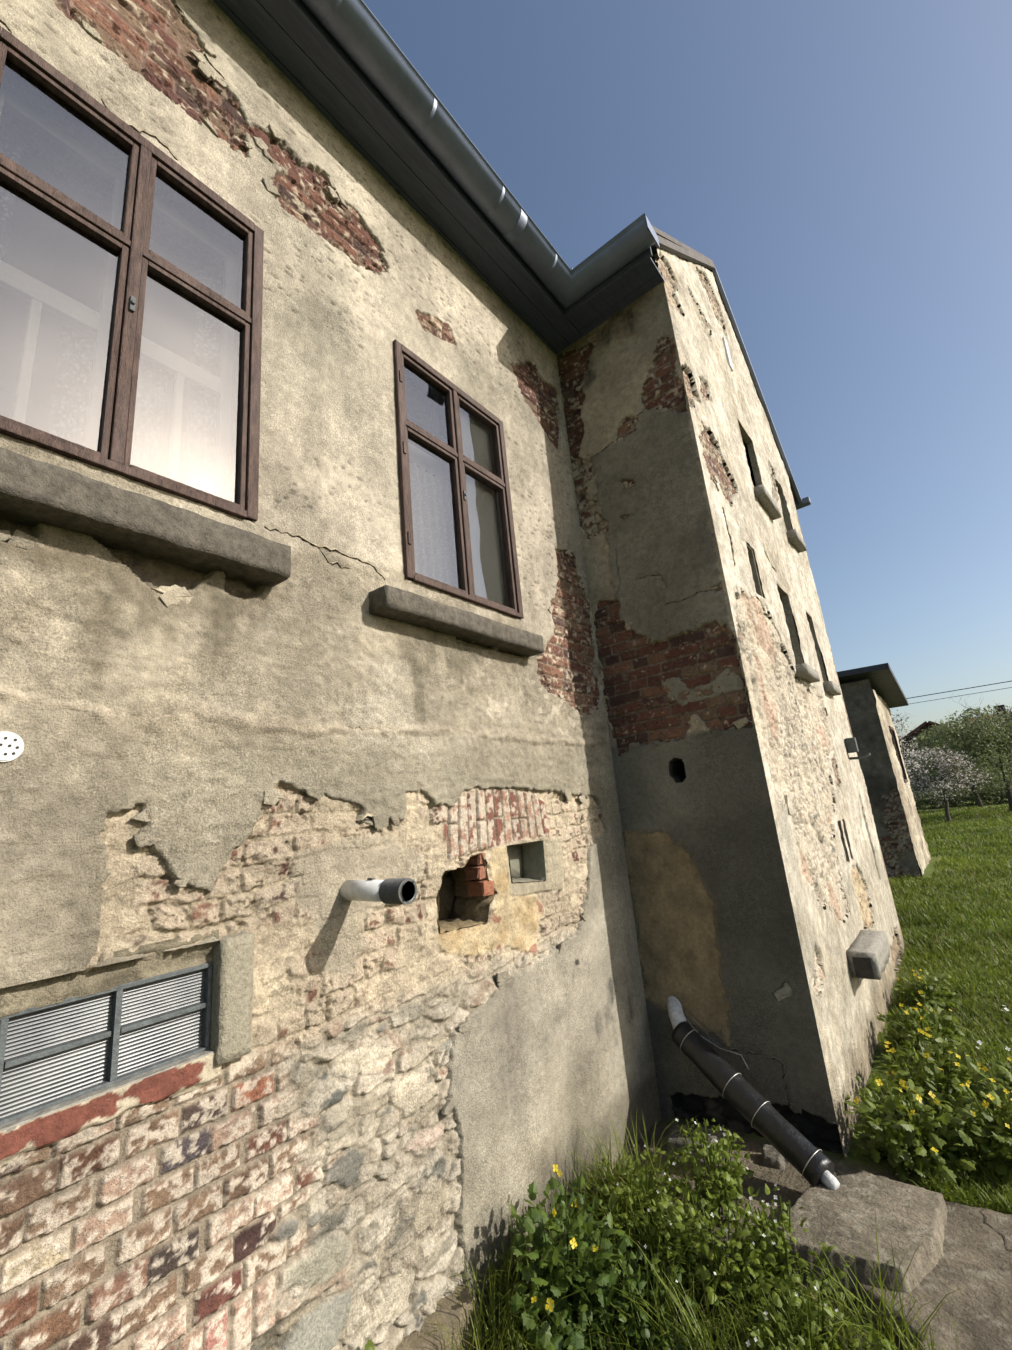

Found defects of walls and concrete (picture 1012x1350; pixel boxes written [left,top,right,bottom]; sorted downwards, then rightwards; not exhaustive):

flaking render [54,0,386,275]
crack [264,526,385,580]
flaking render [415,311,455,345]
flaking render [510,336,629,540]
flaking render [617,337,708,442]
flaking render [699,425,735,506]
flaking render [537,546,873,929]
damp [624,830,731,1048]
flaking render [0,783,605,1350]
crack [980,1208,1011,1250]